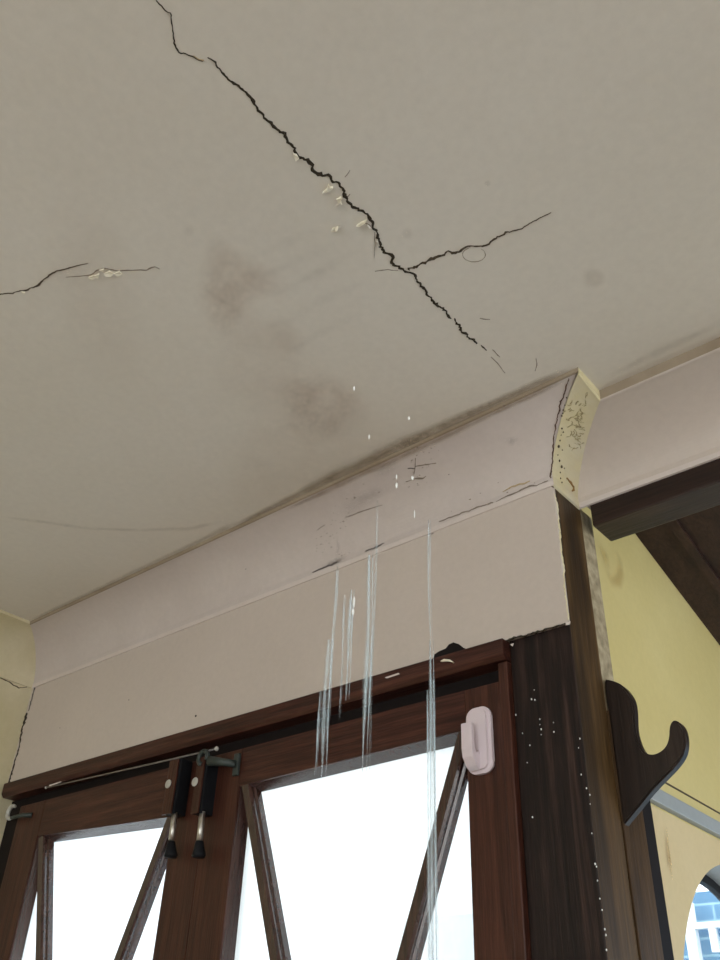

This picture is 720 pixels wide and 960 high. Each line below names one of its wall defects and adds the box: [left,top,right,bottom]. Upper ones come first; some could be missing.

crack [156,0,551,373]
crack [0,263,159,295]
crack [1,678,35,783]